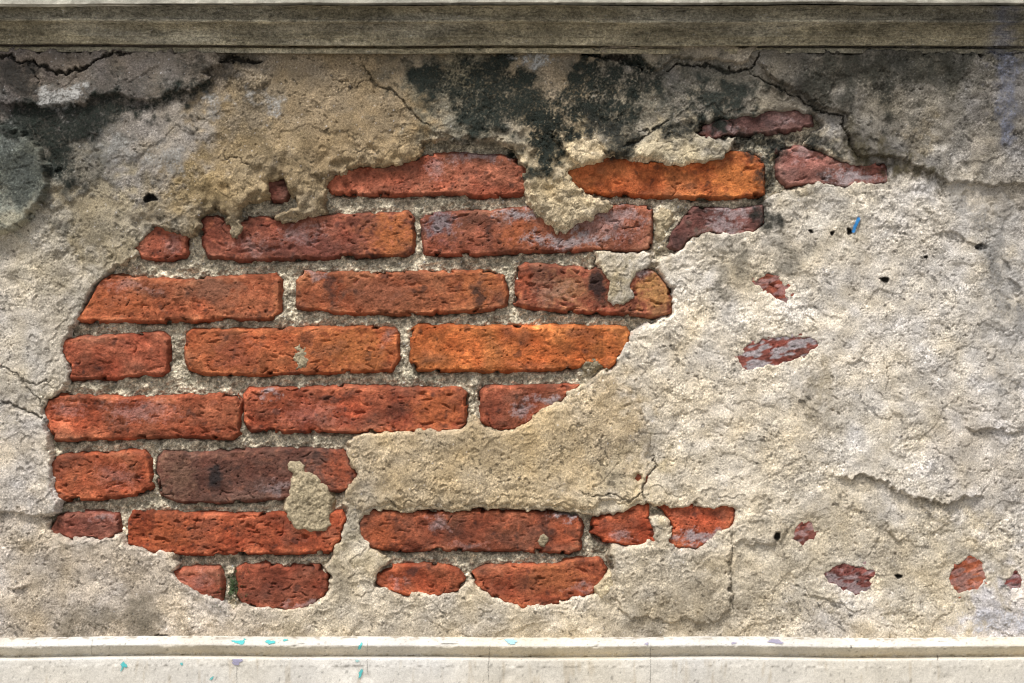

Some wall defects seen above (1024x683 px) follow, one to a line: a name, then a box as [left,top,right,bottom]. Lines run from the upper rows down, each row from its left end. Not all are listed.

crack [0,51,132,82]
damp [0,53,260,188]
damp [407,53,663,179]
crack [582,34,852,147]
flaking render [0,97,888,625]
flaking render [949,555,987,598]
flaking render [1005,570,1022,589]